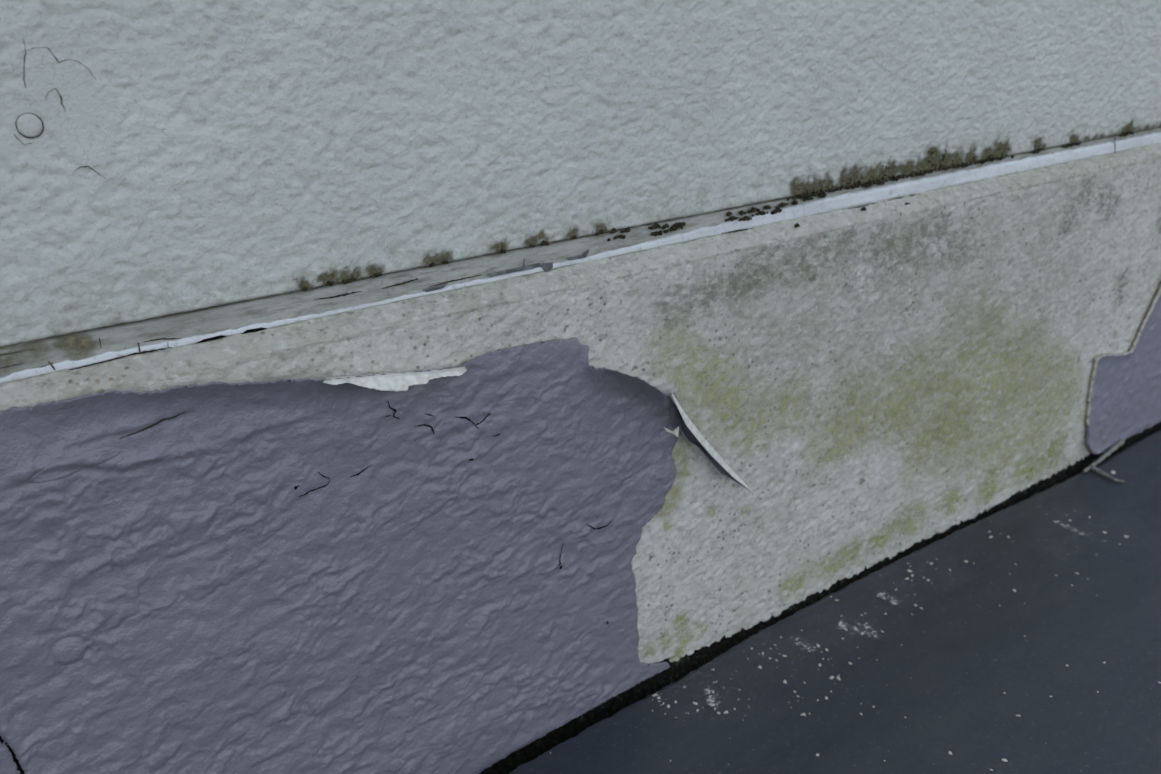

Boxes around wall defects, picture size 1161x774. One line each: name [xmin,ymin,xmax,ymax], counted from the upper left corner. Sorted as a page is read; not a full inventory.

leakage [656,212,967,324]
peeling [120,159,1161,664]
crack [0,736,25,774]